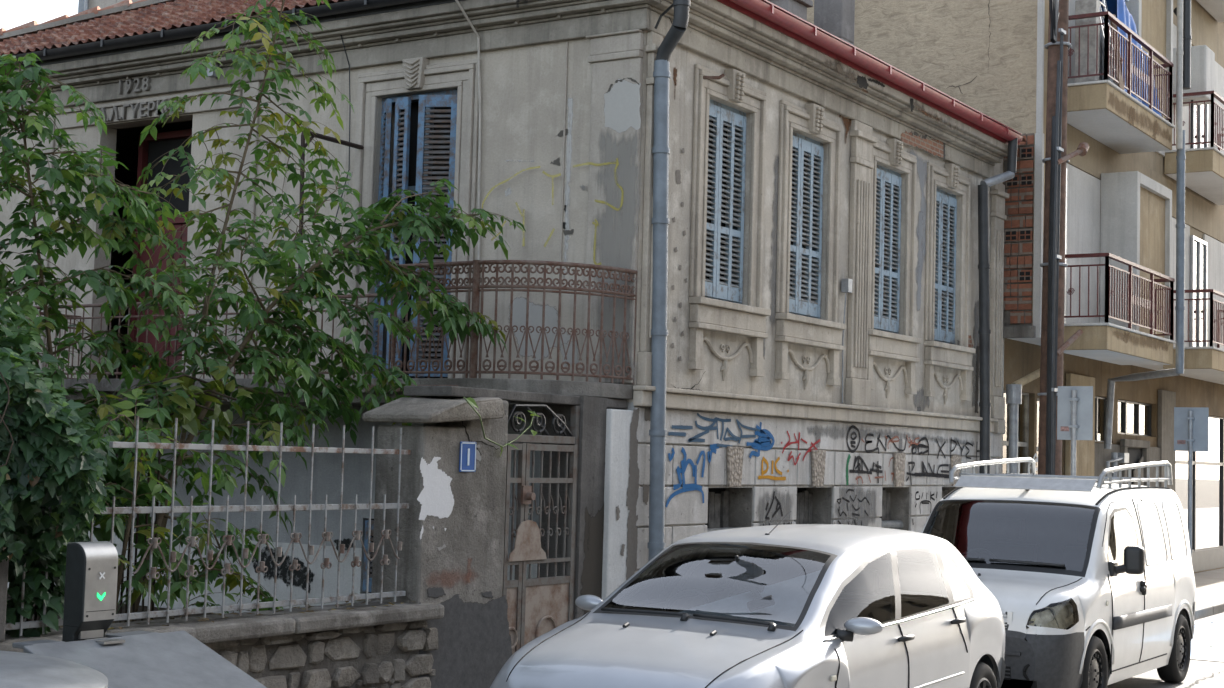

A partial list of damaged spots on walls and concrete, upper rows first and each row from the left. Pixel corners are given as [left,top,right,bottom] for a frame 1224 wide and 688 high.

spalling [604,78,641,133]
peeling [417,457,454,551]